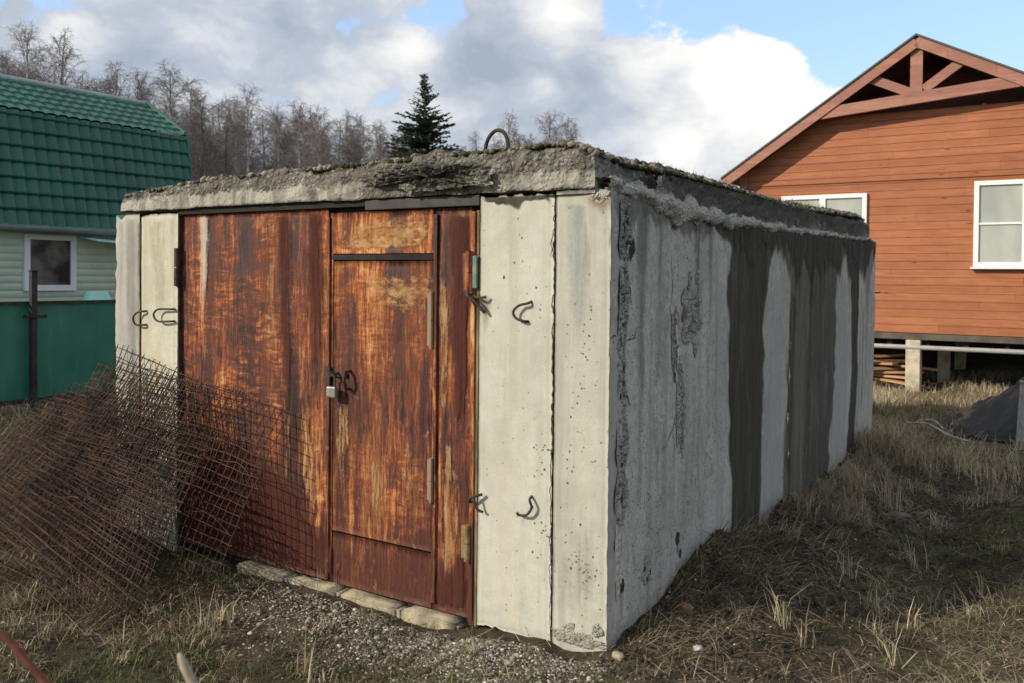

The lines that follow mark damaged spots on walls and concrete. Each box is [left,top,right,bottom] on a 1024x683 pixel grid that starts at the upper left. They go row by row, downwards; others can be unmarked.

spalling [643,175,662,189]
rust [351,221,428,248]
rust [369,278,428,306]
spalling [671,268,703,458]
damp [672,176,877,531]
rust [337,409,348,454]
rust [302,417,315,505]
rust [442,447,458,564]
spalling [550,623,606,650]